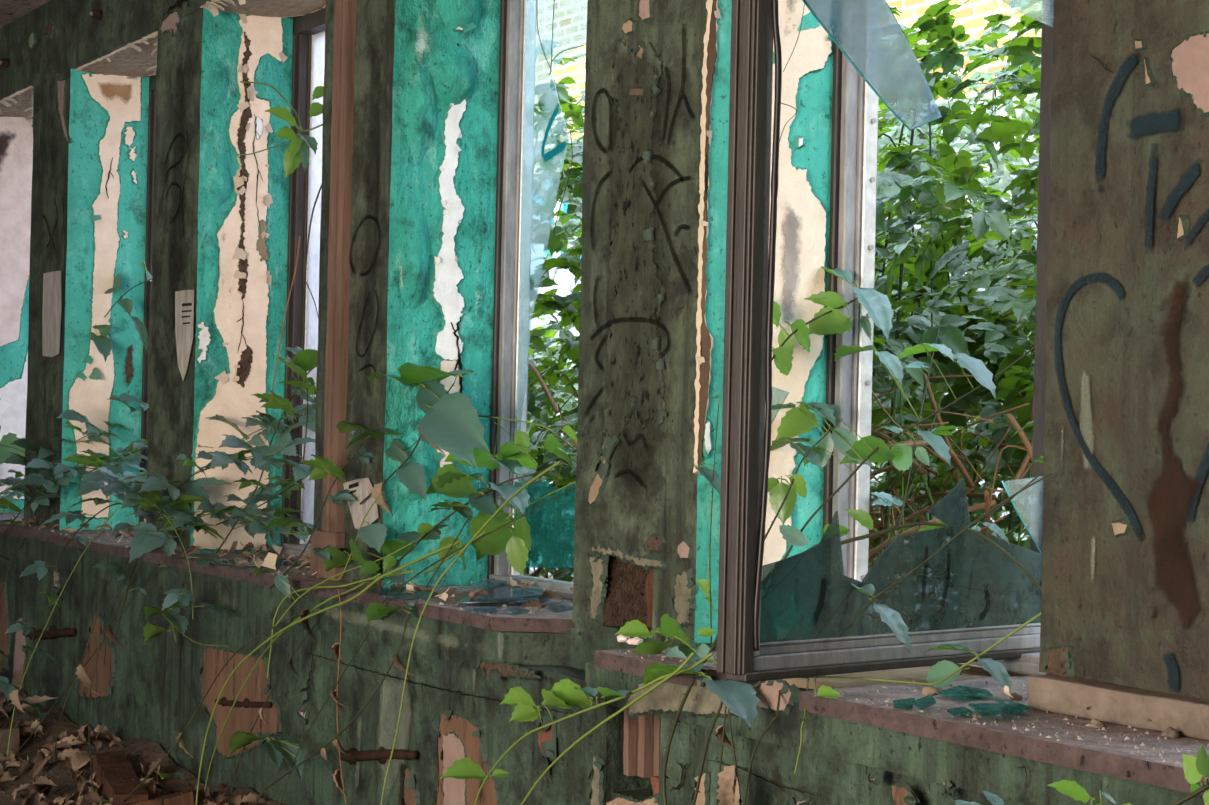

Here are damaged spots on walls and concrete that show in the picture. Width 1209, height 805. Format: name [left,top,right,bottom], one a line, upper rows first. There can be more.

peeling [1170,31,1209,117]
damp [0,133,14,164]
crack [253,114,263,224]
peeling [0,86,34,441]
peeling [57,10,182,520]
peeling [190,0,326,553]
peeling [429,98,467,394]
peeling [762,0,834,566]
peeling [0,463,25,501]
peeling [589,533,697,629]
peeling [199,644,309,759]
peeling [435,709,503,805]